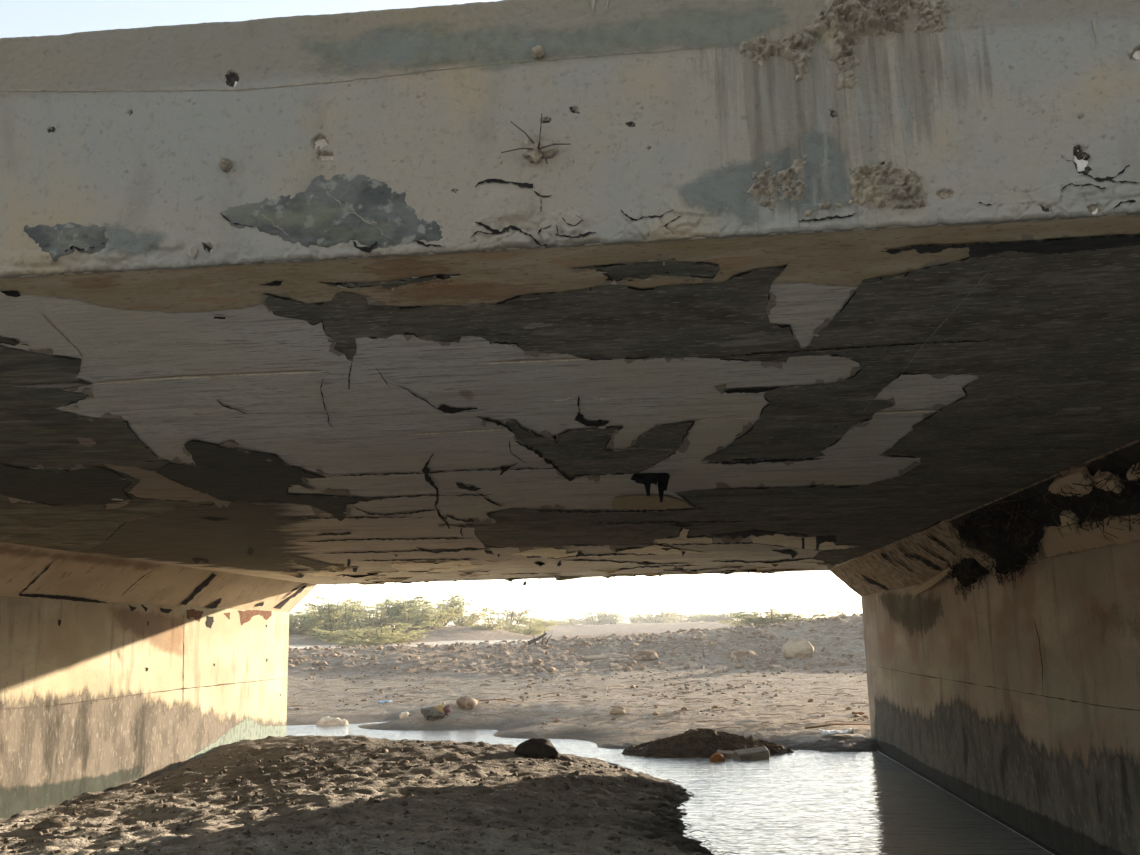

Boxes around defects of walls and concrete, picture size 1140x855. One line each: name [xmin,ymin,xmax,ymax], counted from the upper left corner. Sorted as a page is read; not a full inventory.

leakage [681,18,991,222]
spalling [24,222,109,262]
flaking render [0,337,388,552]
crack [278,441,564,572]
flaking render [256,234,1140,609]
leakage [0,688,287,790]
leakage [874,697,1140,855]